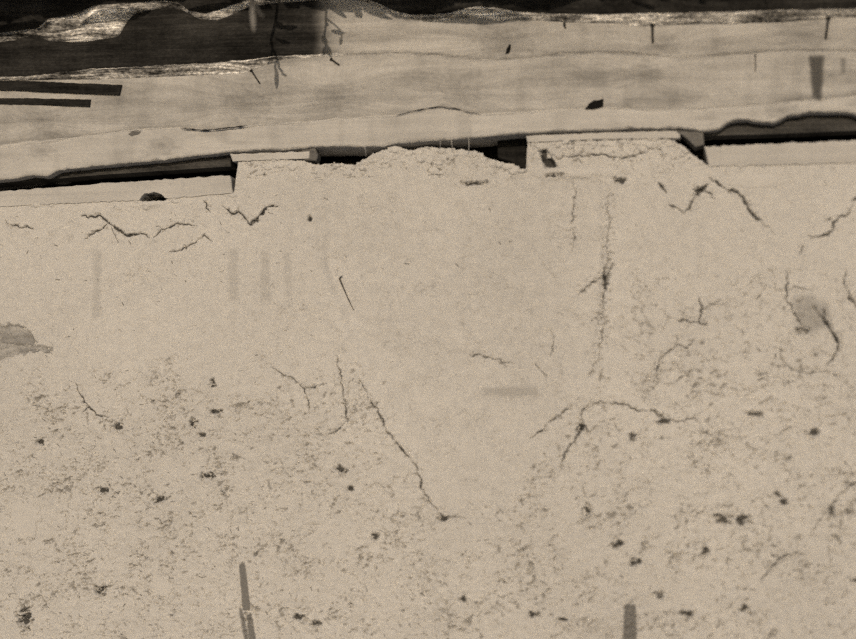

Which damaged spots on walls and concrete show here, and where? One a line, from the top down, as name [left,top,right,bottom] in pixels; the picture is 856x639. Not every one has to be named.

spalling [302,148,321,163]
spalling [541,150,557,177]
crack [82,200,278,252]
crack [658,177,768,227]
crack [800,198,856,254]
crack [578,193,613,372]
crack [656,297,720,372]
crack [755,274,839,376]
crack [273,357,459,518]
crack [531,401,698,464]